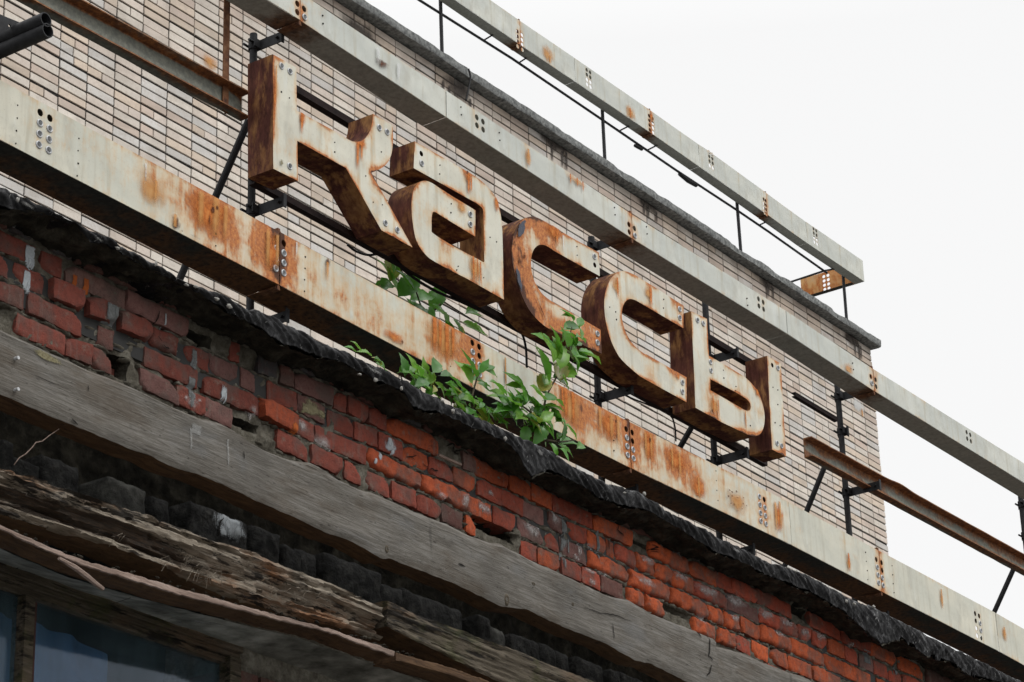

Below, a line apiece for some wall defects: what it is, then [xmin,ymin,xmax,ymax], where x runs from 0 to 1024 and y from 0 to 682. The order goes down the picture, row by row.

rust [143,180,164,199]
rust [190,191,228,232]
rust [267,230,279,268]
rust [644,432,654,456]
rust [691,476,704,496]